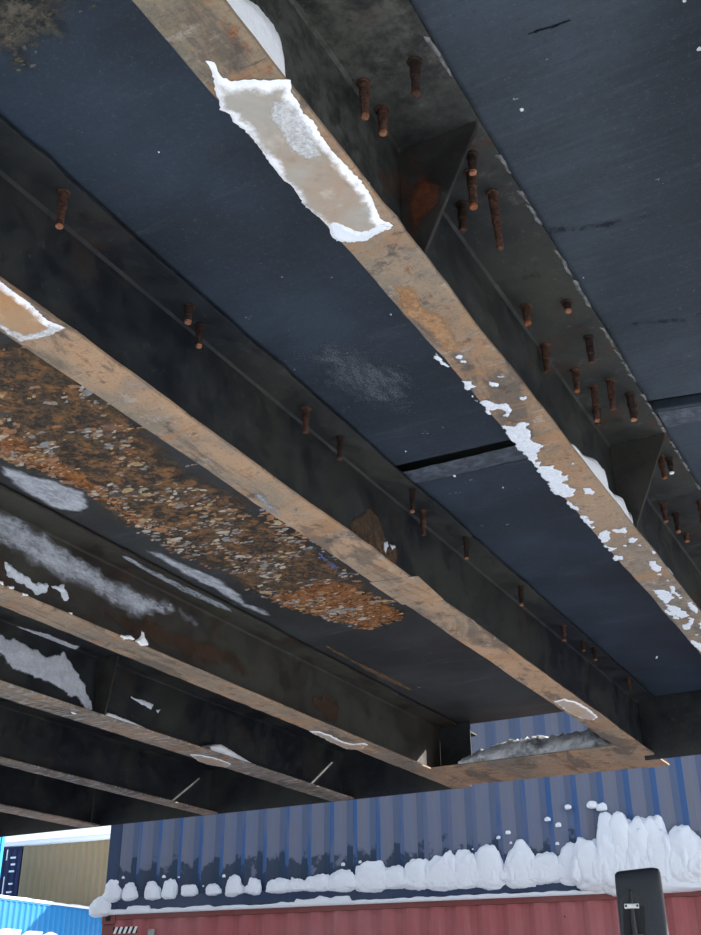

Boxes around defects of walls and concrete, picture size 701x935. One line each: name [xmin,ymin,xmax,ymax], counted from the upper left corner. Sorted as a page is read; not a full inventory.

crack [528,20,571,35]
corrosion [0,344,404,630]